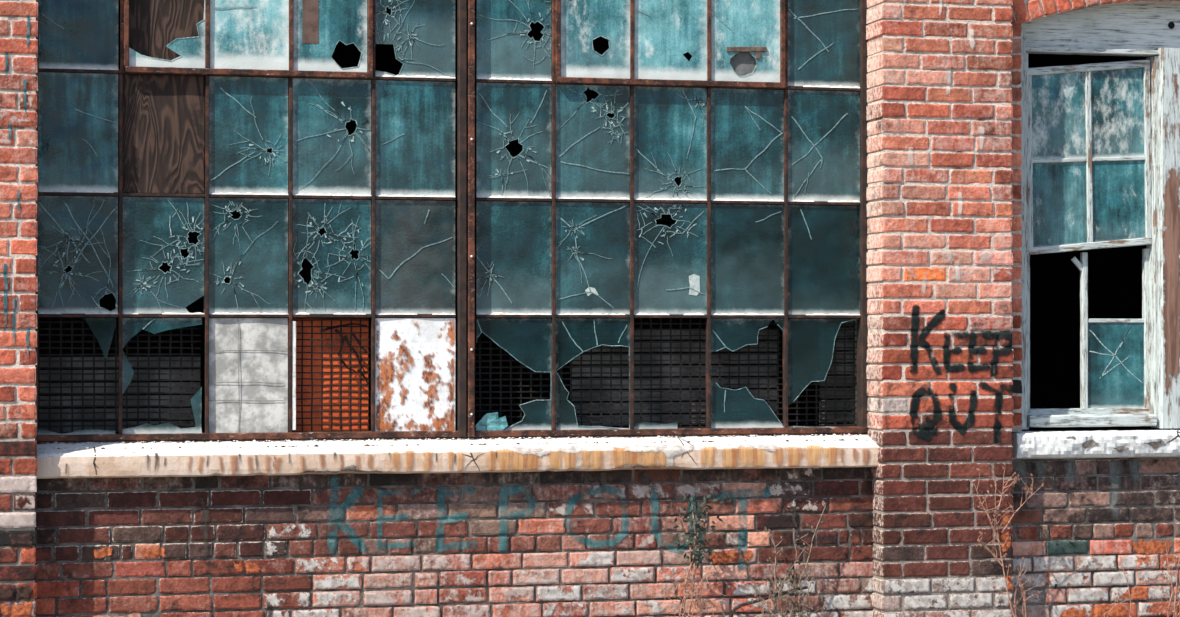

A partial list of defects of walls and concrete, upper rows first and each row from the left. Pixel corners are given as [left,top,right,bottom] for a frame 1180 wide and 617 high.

peeling [1163,168,1180,395]
corrosion [375,318,455,432]
peeling [550,485,599,516]
peeling [616,484,719,498]
peeling [769,468,825,511]
peeling [267,525,311,556]
spalling [234,562,261,574]
peeling [265,552,697,617]
peeling [706,515,1180,617]